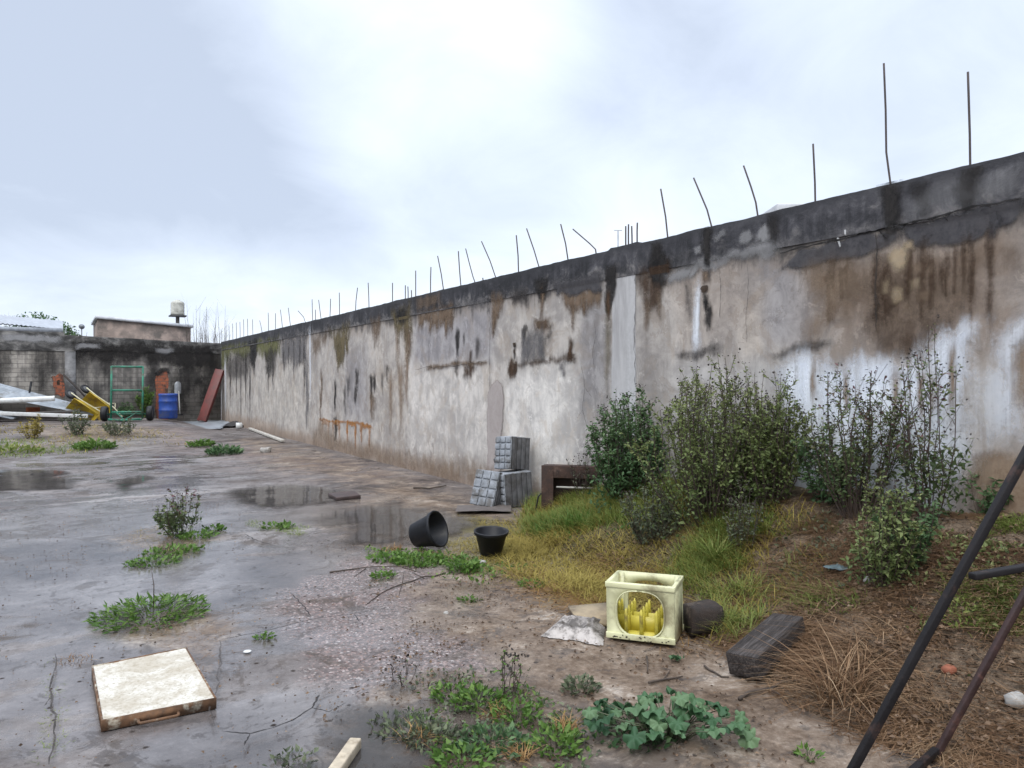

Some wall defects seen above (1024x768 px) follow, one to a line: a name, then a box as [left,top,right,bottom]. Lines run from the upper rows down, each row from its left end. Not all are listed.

damp [73,304,485,448]
damp [468,264,616,376]
damp [639,242,670,326]
damp [680,287,716,360]
damp [701,226,712,266]
crack [780,198,1023,332]
damp [782,165,1024,326]
corrosion [323,418,370,447]
crack [44,654,58,762]
crack [209,592,392,745]